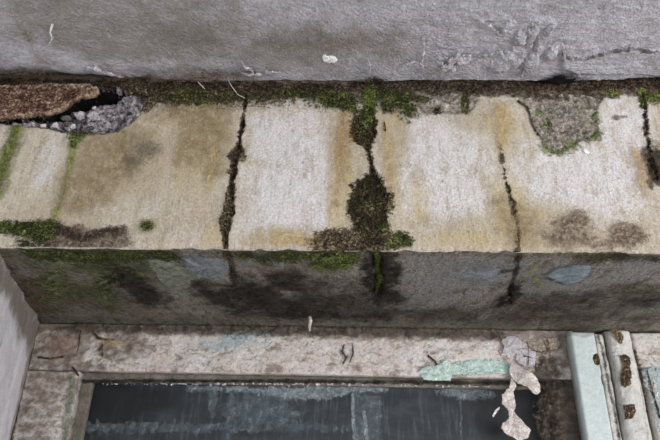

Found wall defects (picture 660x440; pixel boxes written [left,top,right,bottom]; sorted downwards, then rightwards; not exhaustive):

spalling [0,85,177,135]
flaking render [517,93,603,157]
crack [637,87,660,189]
damp [44,223,136,251]
crack [219,97,248,286]
crack [304,83,416,307]
crack [494,144,523,308]
damp [543,210,660,264]
damp [58,264,660,341]
peeling [418,336,560,440]